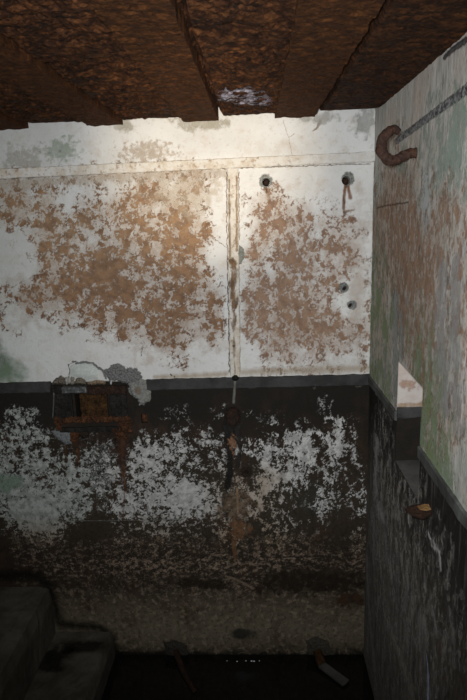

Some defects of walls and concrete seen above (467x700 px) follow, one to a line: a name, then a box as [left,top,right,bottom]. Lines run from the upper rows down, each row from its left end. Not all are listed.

peeling [0,170,226,371]
peeling [239,160,467,462]
flaking render [52,363,151,405]
rust [65,432,134,492]
leakage [222,424,242,515]